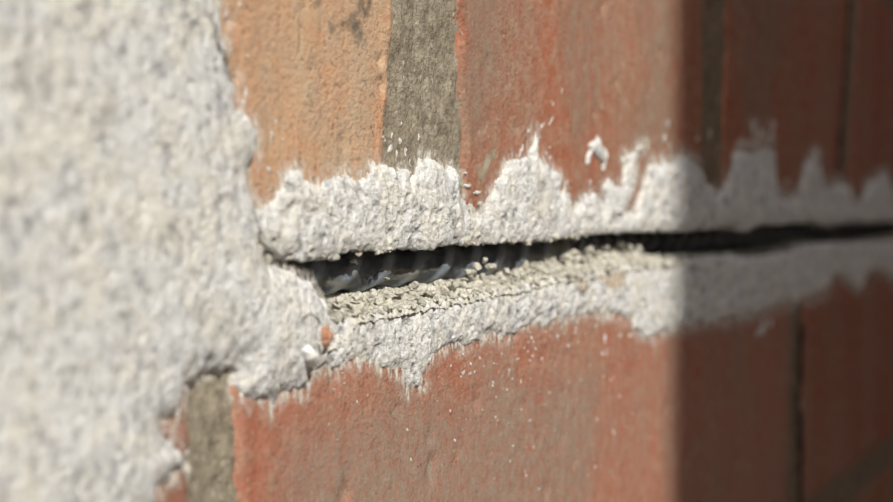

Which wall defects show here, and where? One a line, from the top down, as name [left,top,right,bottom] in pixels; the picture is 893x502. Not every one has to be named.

crack [796,305,804,502]